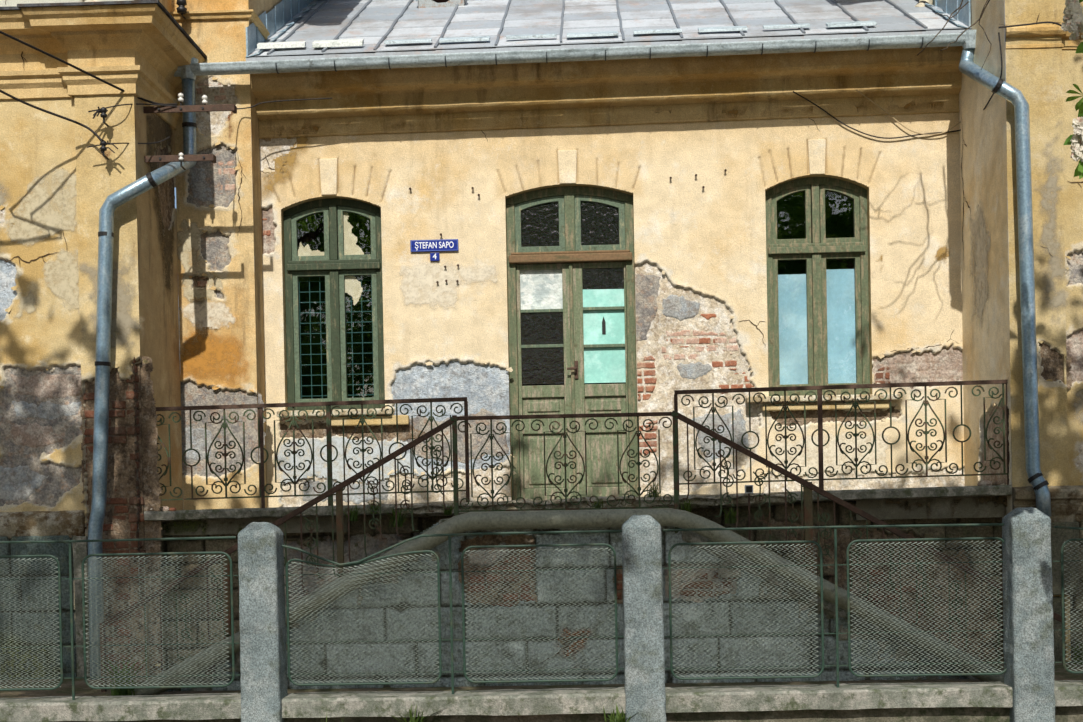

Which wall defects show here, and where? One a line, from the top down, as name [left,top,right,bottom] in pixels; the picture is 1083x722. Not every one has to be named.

flaking render [187,76,240,208]
flaking render [259,138,296,173]
flaking render [0,259,18,321]
flaking render [1065,250,1083,285]
flaking render [635,262,902,493]
flaking render [872,345,963,389]
flaking render [1039,329,1083,389]
flaking render [0,365,95,529]
flaking render [180,379,266,477]
flaking render [279,359,516,507]
flaking render [102,355,164,677]